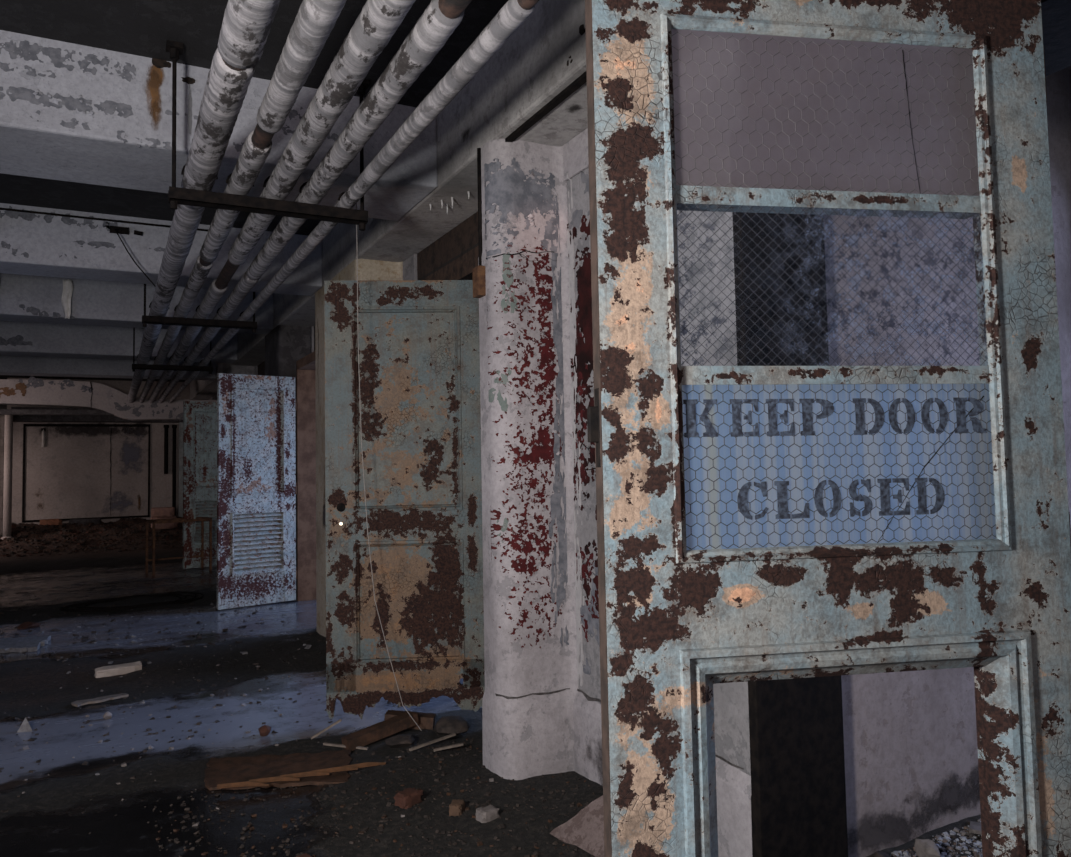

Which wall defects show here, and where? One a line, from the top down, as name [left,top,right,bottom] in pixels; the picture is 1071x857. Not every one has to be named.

peeling [0,40,172,151]
rust [147,65,164,126]
peeling [484,157,600,648]
water stain [847,767,980,851]